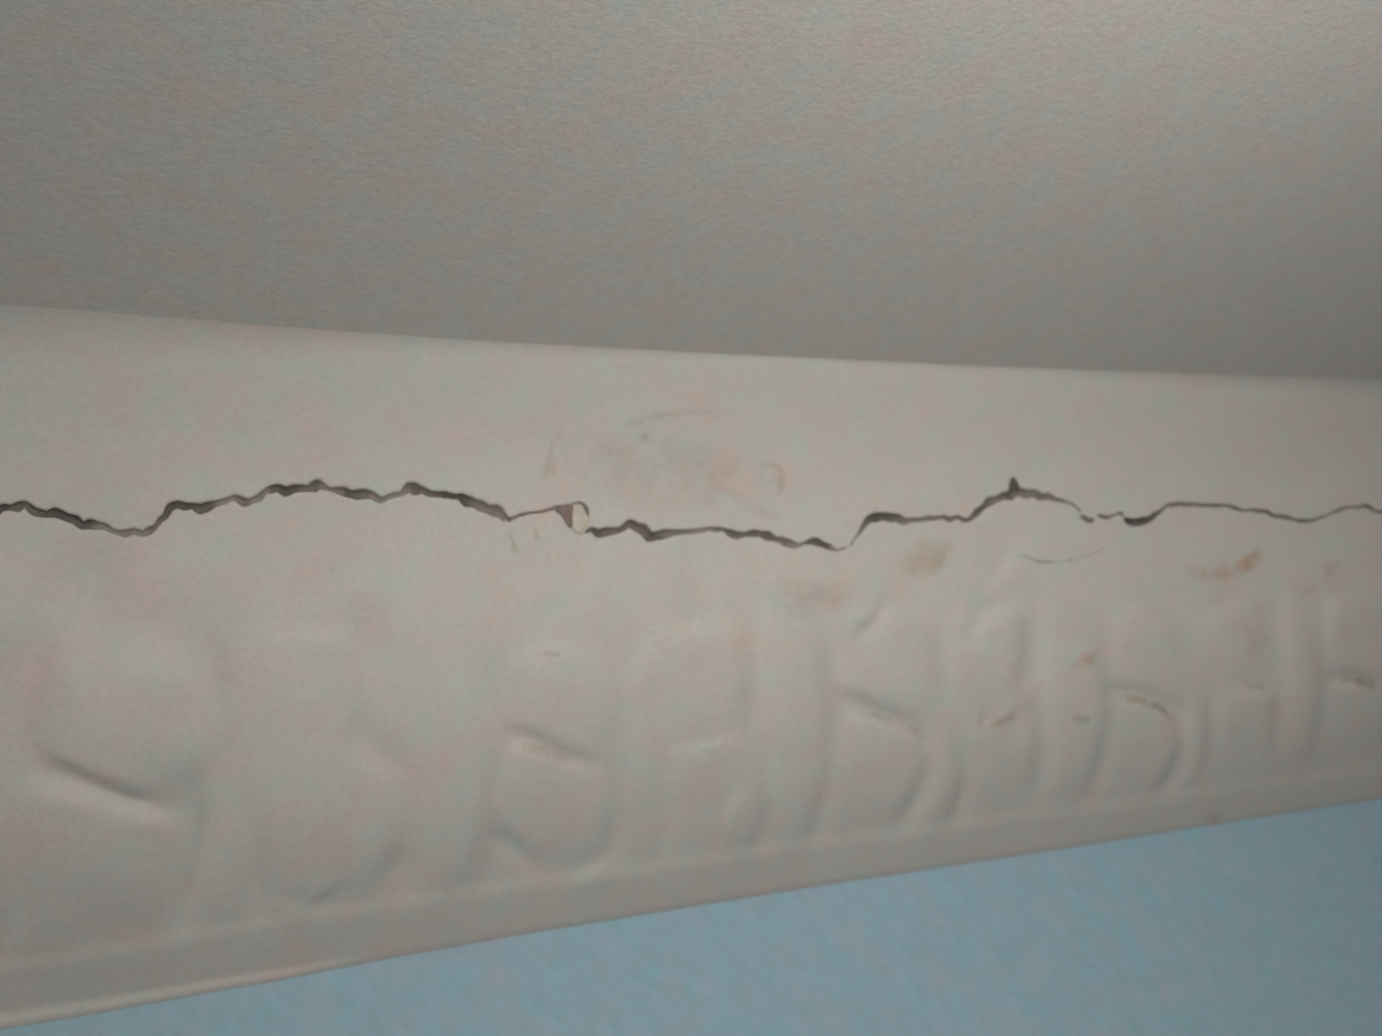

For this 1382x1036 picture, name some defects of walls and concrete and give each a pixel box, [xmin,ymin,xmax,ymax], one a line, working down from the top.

crack [0,479,560,538]
crack [585,477,1382,551]